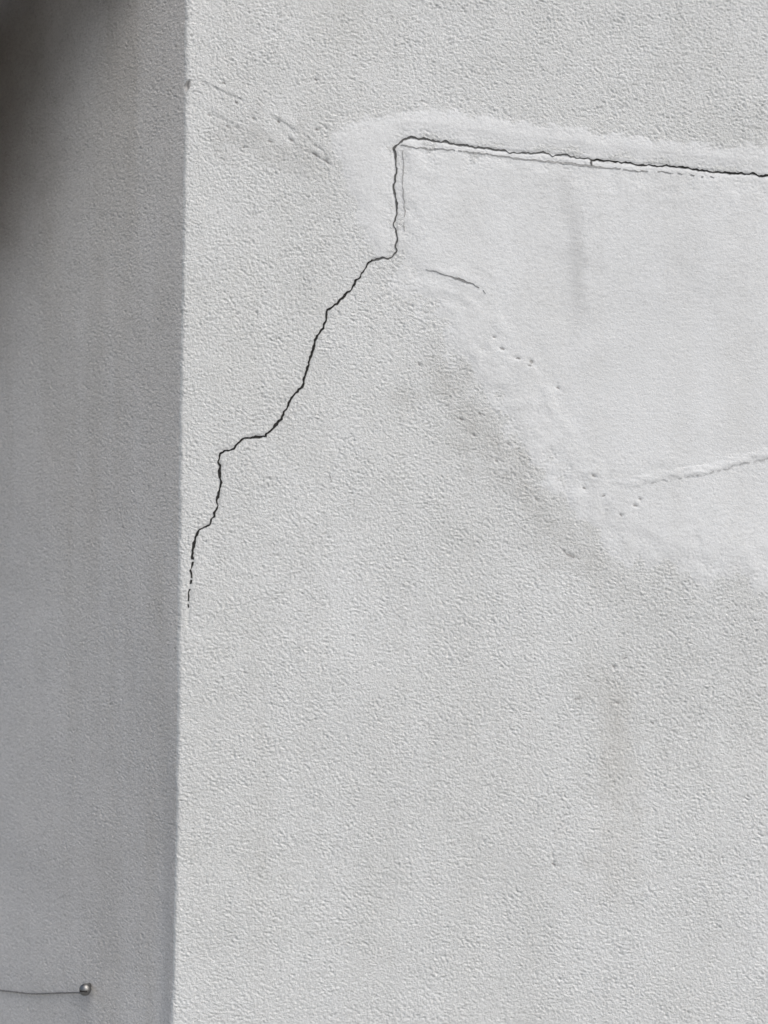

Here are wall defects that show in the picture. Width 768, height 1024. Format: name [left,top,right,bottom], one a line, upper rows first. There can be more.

crack [188,136,768,608]